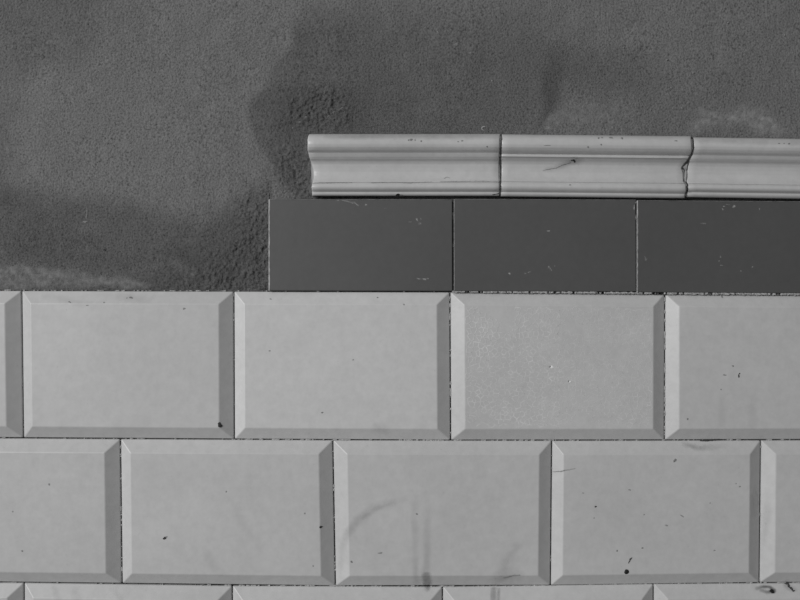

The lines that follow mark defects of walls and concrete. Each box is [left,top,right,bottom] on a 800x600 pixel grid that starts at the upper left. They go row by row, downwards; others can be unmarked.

crack [682,138,694,196]